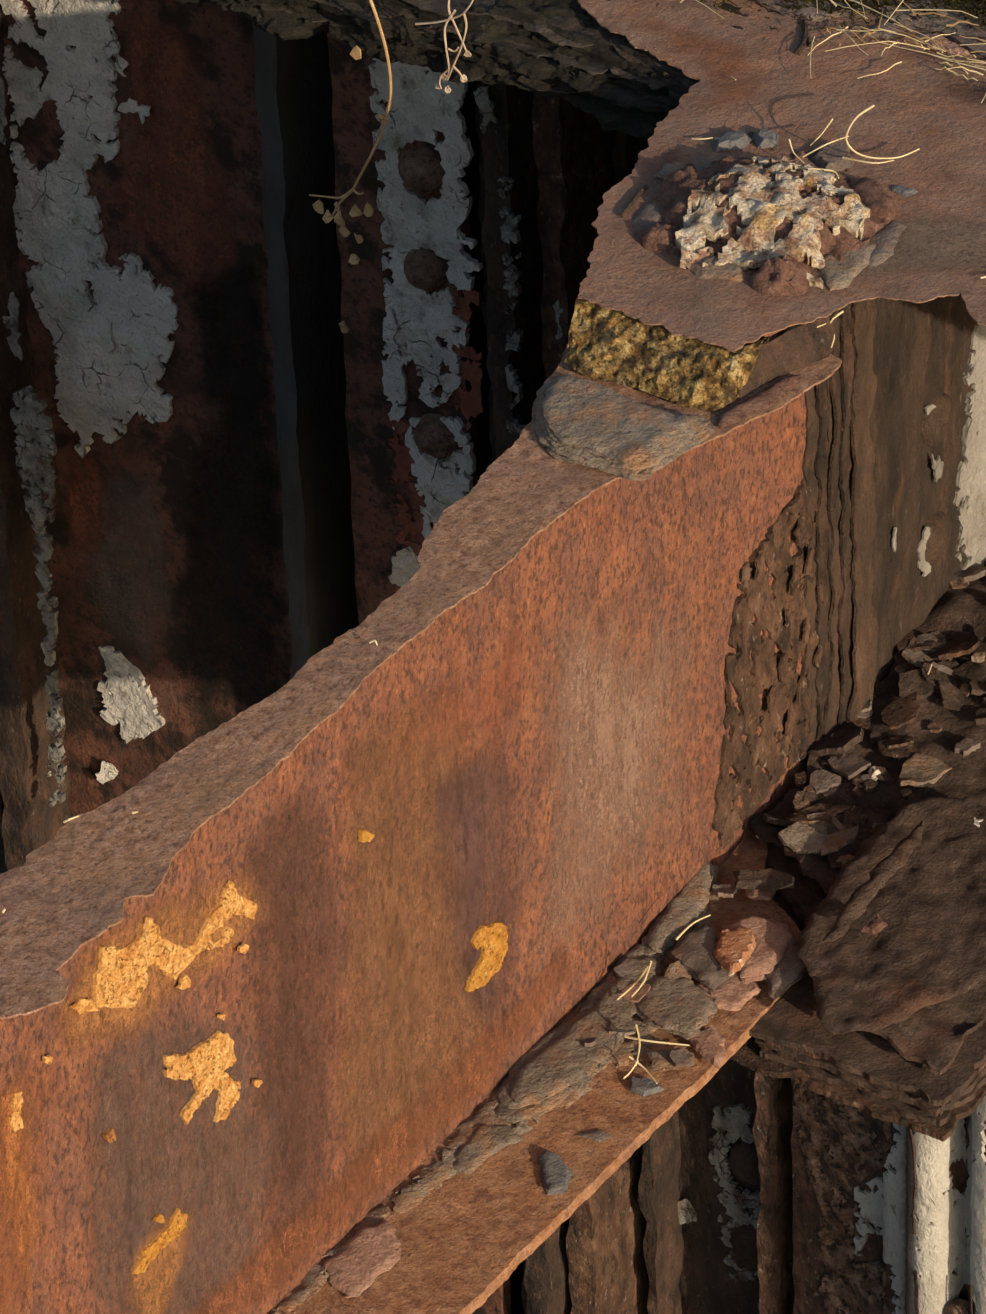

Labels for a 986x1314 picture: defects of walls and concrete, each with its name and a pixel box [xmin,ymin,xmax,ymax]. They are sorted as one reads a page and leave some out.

peeling [0,0,179,807]
peeling [368,58,498,587]
peeling [497,175,526,436]
peeling [917,526,931,577]
peeling [931,324,986,570]
corrosion [2,1088,36,1295]
corrosion [65,881,263,1314]
corrosion [323,1219,401,1298]
corrosion [453,1124,523,1174]
corrosion [538,1149,573,1195]
peeling [708,1104,761,1282]
peeling [792,1081,986,1314]